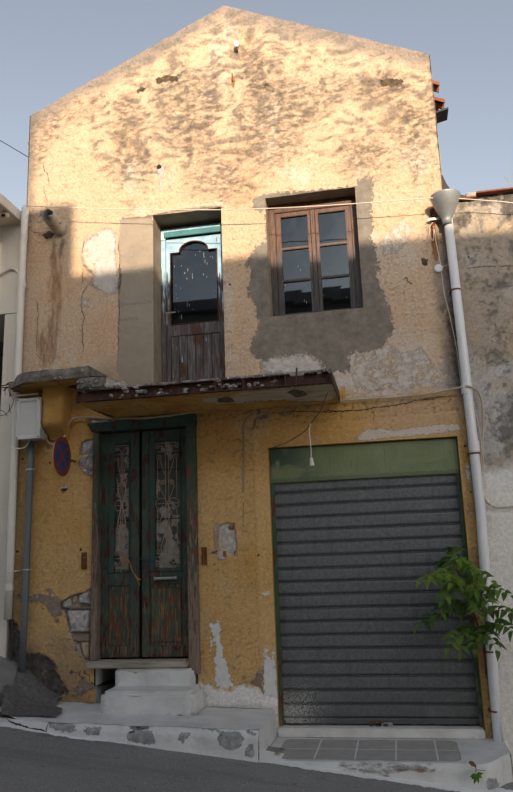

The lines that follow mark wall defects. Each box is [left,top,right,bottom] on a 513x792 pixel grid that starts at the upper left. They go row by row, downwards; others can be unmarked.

flaking render [81,227,121,294]
crack [81,239,121,364]
flaking render [262,353,325,377]
flaking render [349,344,439,391]
flaking render [202,384,337,421]
crack [226,395,461,421]
peeling [345,424,461,442]
flaking render [78,439,93,478]
flaking render [12,588,94,697]
peeling [250,667,264,693]